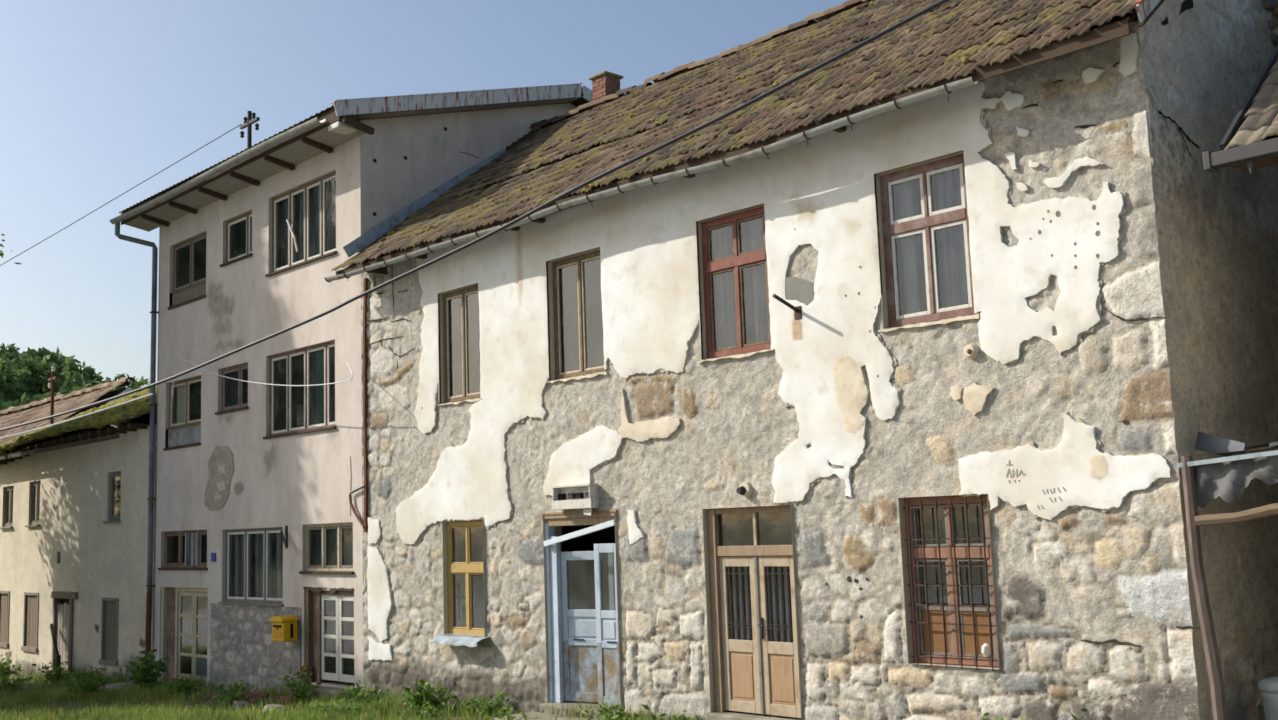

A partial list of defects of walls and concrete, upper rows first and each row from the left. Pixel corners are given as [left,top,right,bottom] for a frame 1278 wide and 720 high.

spalling [361,21,1200,720]
spalling [204,446,234,511]
crack [1080,639,1141,647]